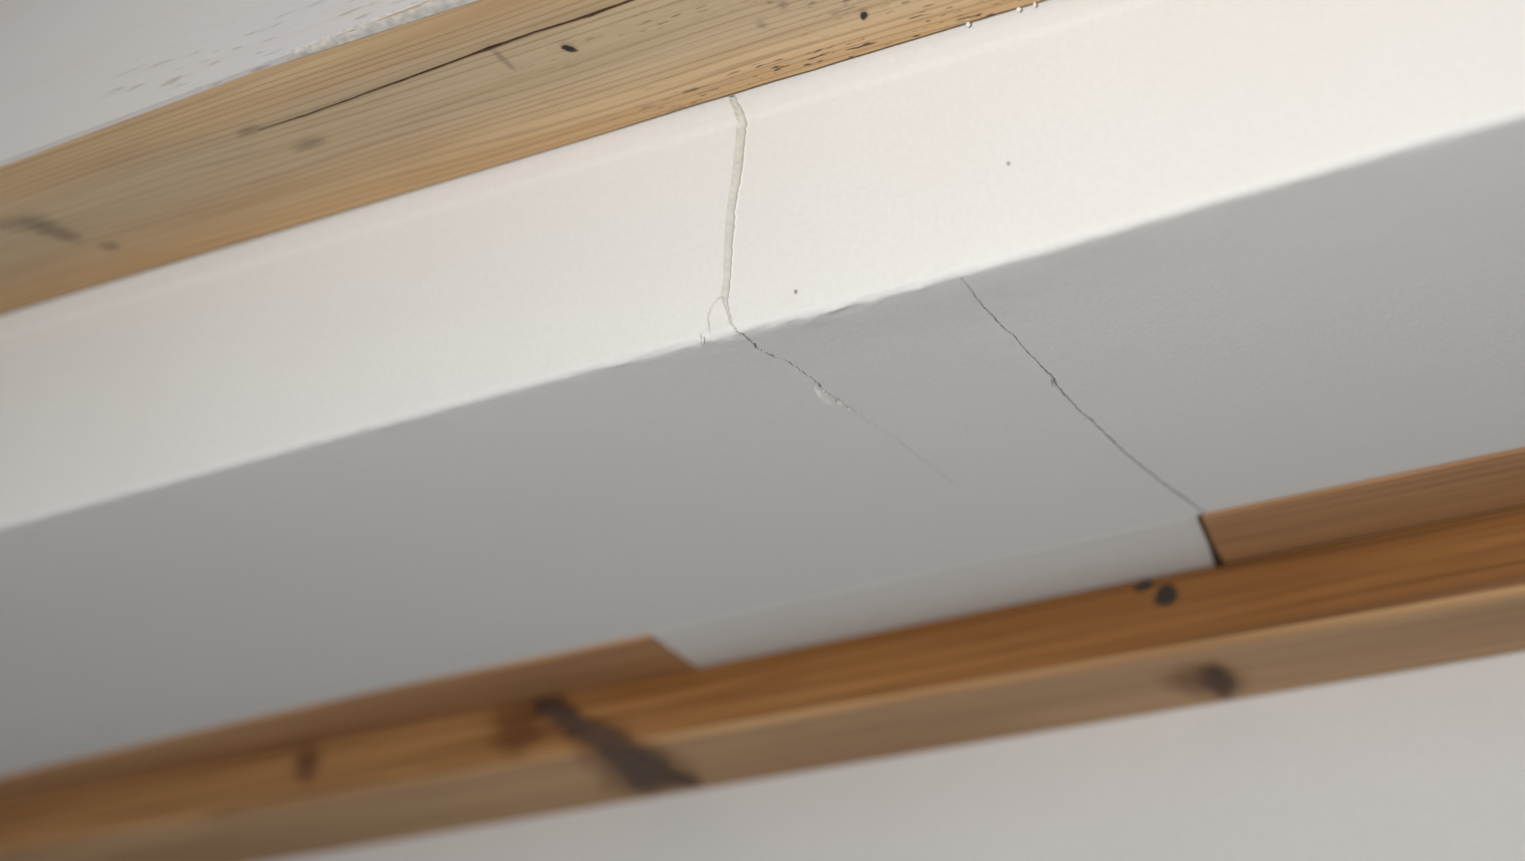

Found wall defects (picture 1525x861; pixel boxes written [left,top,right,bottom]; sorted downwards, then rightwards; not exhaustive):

crack [700,96,961,488]
crack [960,277,1205,514]